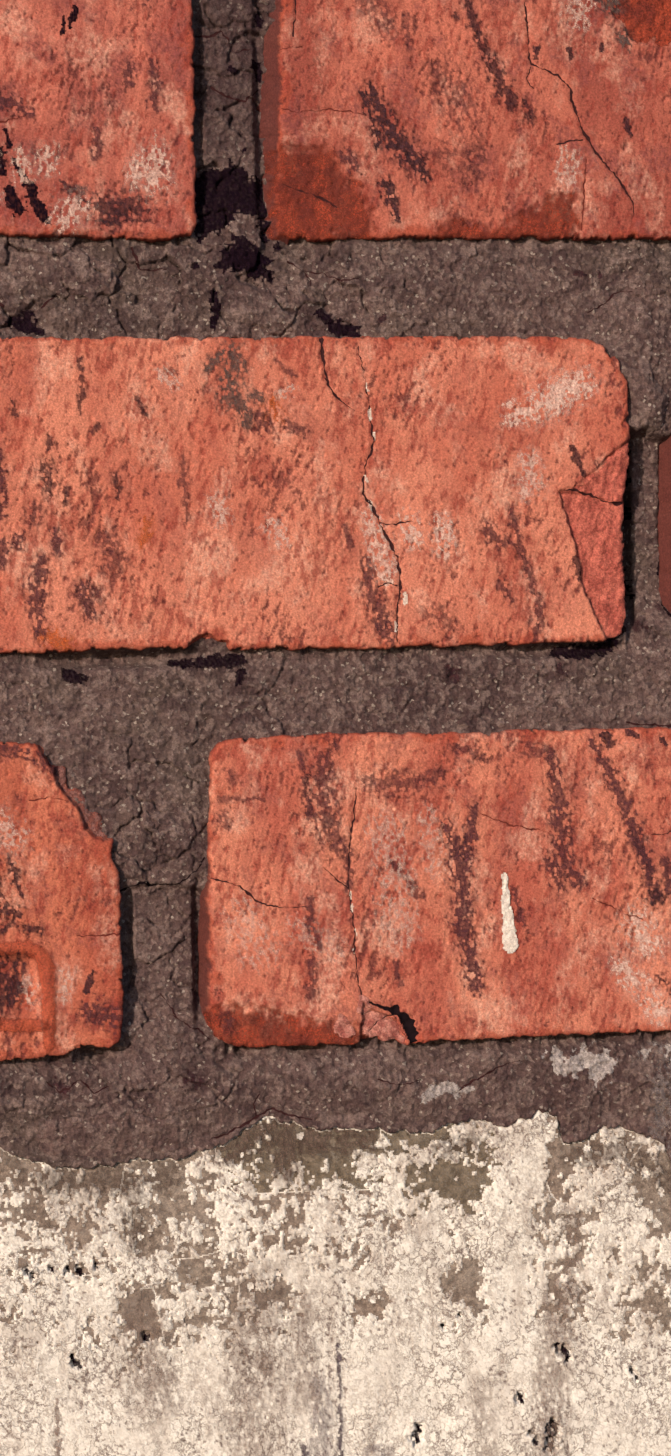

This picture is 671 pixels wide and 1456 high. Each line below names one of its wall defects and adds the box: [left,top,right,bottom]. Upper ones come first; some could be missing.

crack [195,0,302,53]
crack [210,86,364,115]
crack [524,2,634,231]
crack [319,338,410,642]
crack [120,857,306,908]
crack [323,788,419,1044]
crack [459,1060,520,1091]
water stain [215,1118,377,1181]
water stain [30,1169,171,1245]
water stain [536,1235,581,1456]
water stain [54,1399,62,1456]
water stain [313,1343,343,1456]